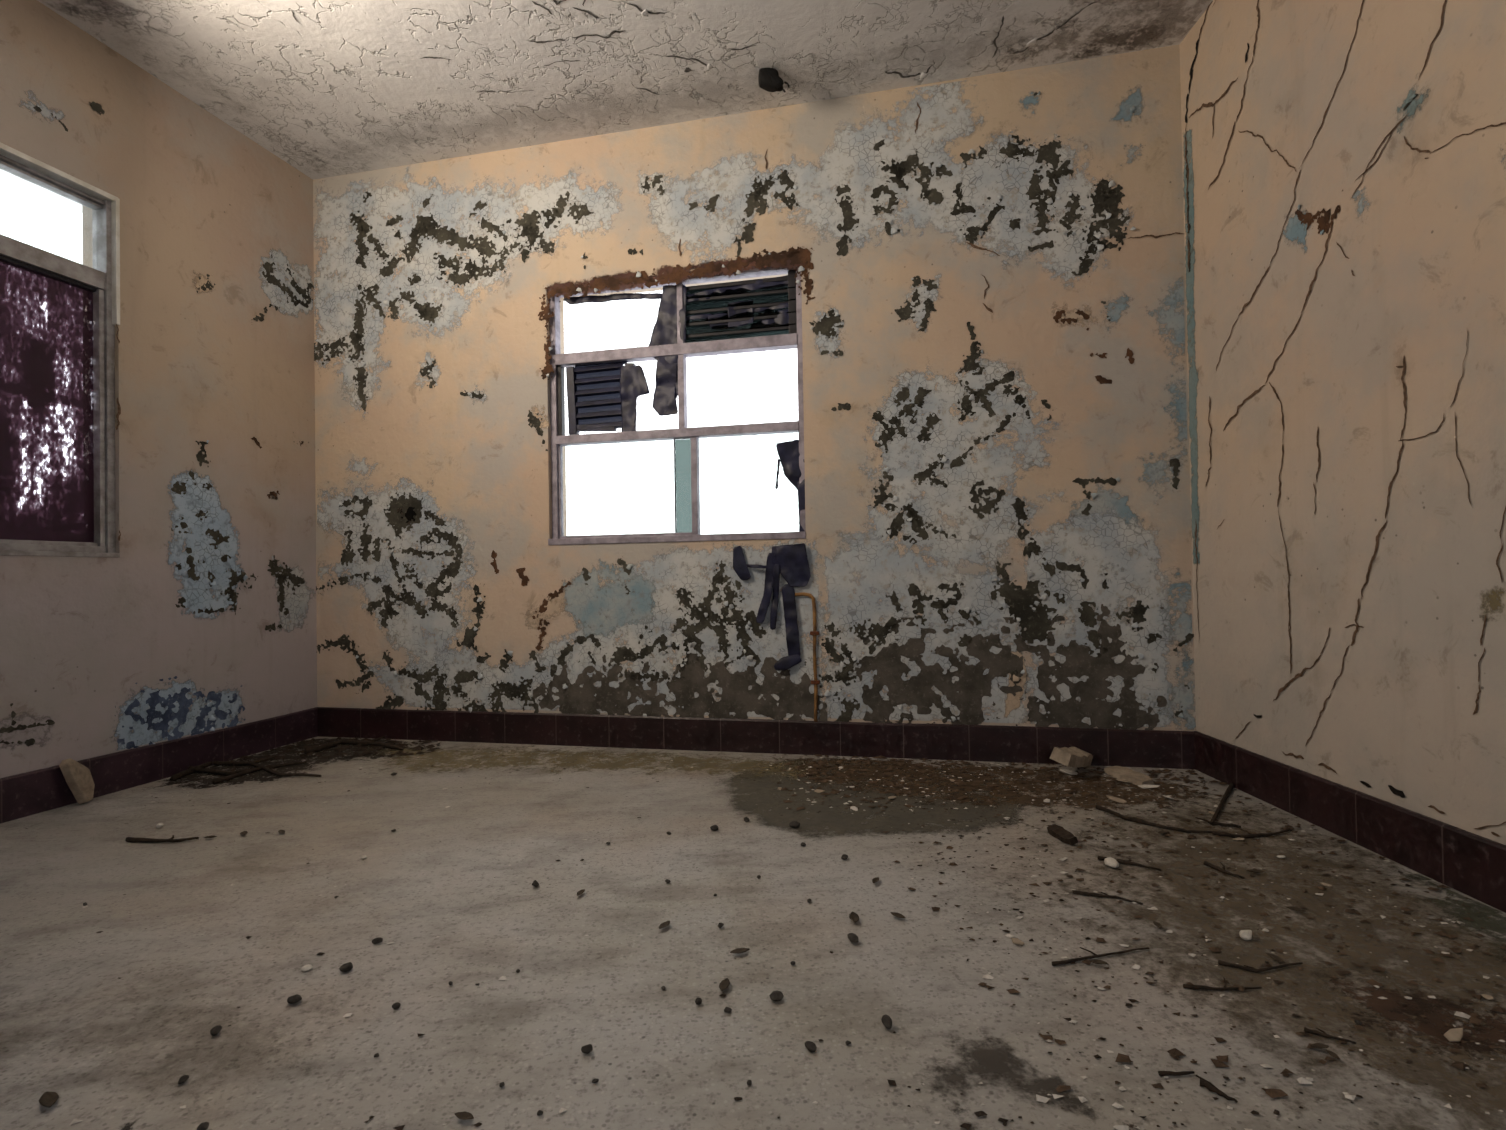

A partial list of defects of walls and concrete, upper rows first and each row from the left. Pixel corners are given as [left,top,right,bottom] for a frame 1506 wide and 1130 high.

crack [480,0,668,93]
crack [631,45,756,95]
crack [885,60,935,133]
crack [992,0,1100,58]
crack [966,242,1000,313]
crack [114,398,122,430]
peeling [168,80,1200,730]
crack [1128,0,1506,837]
peeling [114,676,245,750]